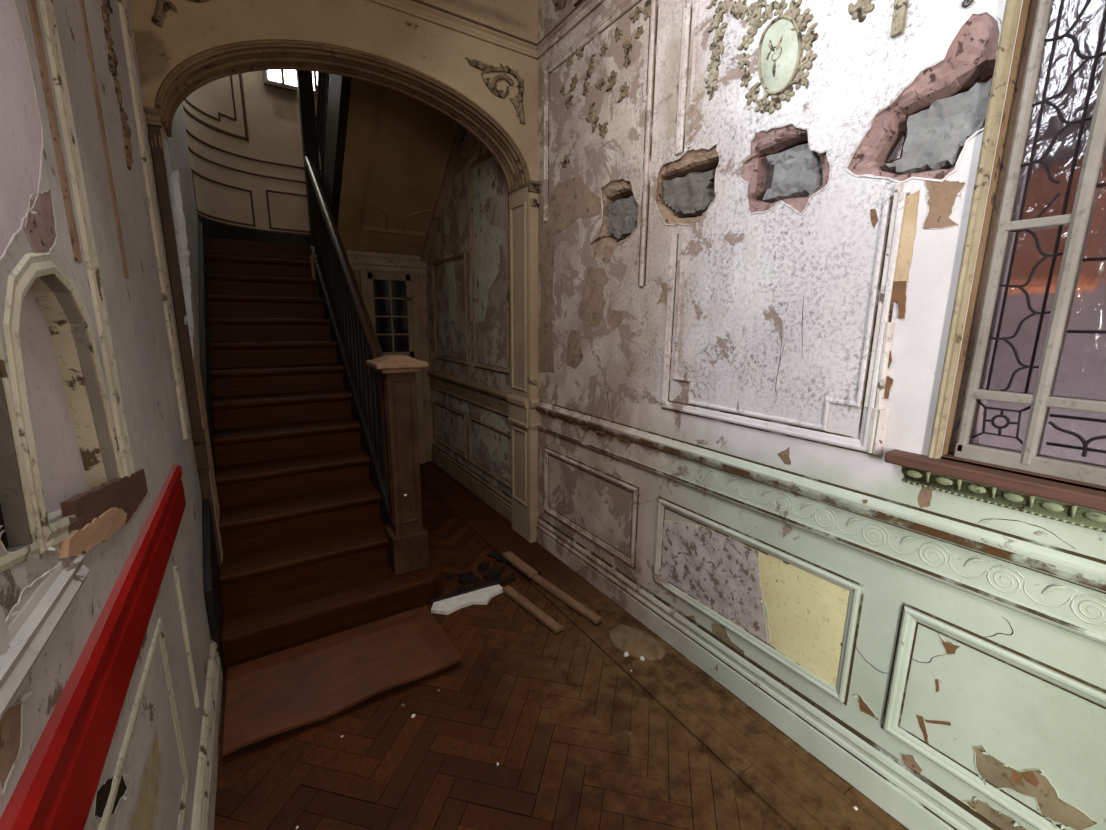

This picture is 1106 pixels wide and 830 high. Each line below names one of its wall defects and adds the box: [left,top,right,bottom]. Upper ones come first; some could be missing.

spalling [845,8,1002,229]
spalling [655,142,721,226]
spalling [739,122,832,215]
spalling [538,175,639,373]
peeling [657,282,668,304]
peeling [777,447,791,465]
peeling [918,487,933,508]
peeling [660,520,768,655]
peeling [964,745,1098,830]